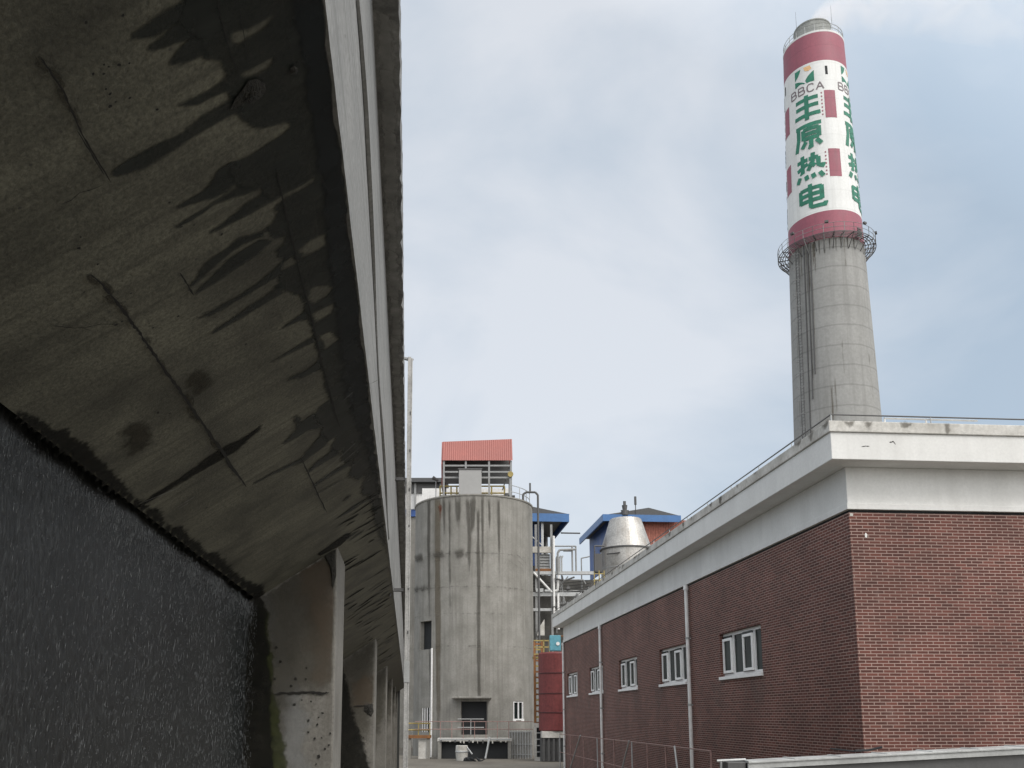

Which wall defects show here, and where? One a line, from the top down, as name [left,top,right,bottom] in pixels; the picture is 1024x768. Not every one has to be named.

crack [37,57,111,204]
crack [52,274,247,487]
water stain [16,0,397,768]
water stain [414,500,500,699]